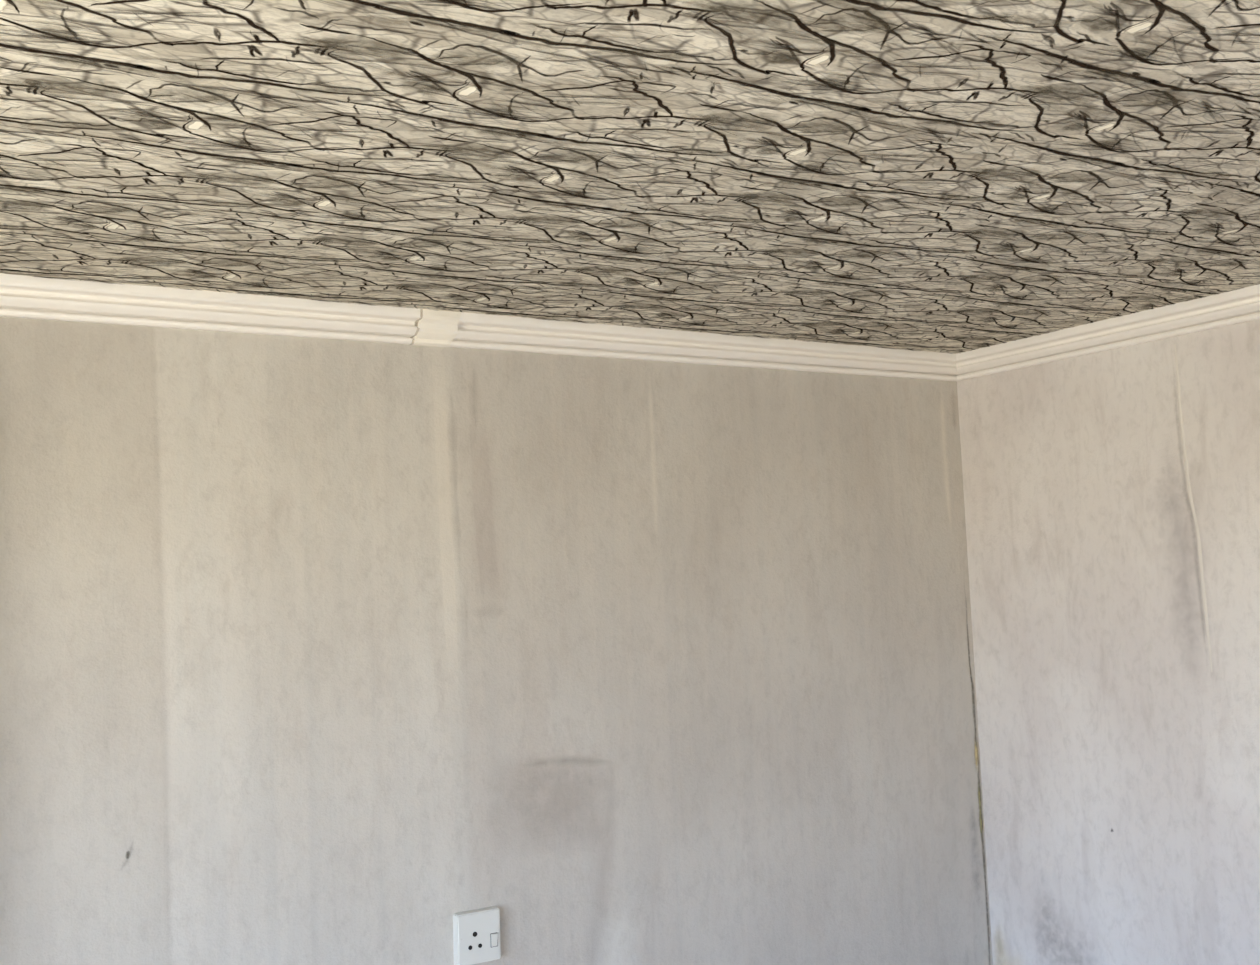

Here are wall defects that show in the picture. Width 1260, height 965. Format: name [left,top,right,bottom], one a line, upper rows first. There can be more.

crack [411,309,462,347]